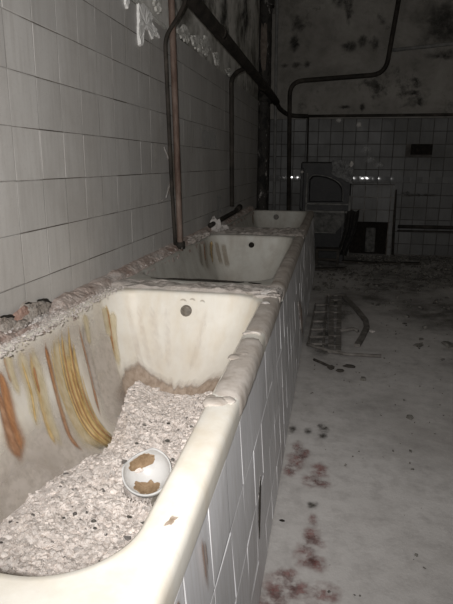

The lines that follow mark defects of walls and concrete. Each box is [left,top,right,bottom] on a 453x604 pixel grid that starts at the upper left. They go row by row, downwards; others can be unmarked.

spalling [0,298,52,332]
corrosion [103,307,119,362]
corrosion [0,316,111,457]